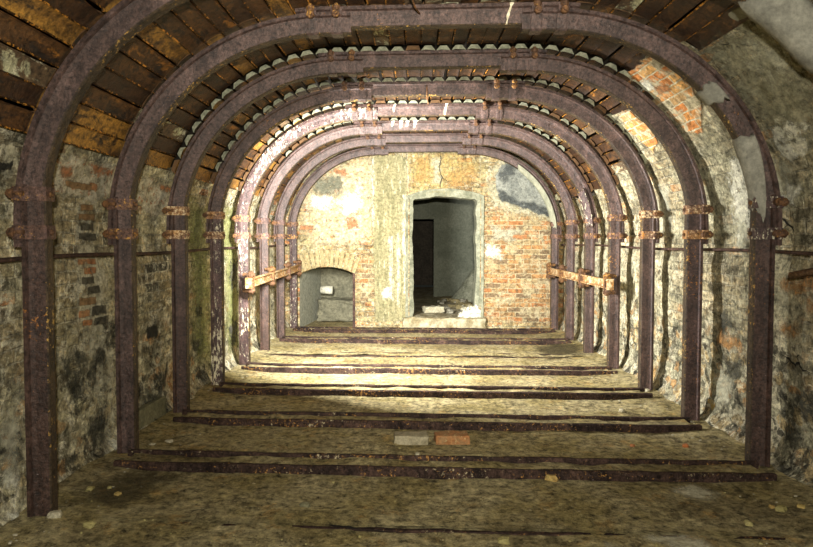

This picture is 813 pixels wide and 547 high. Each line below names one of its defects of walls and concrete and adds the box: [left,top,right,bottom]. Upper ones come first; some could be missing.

flaking render [628,57,703,134]
leakage [60,321,117,449]